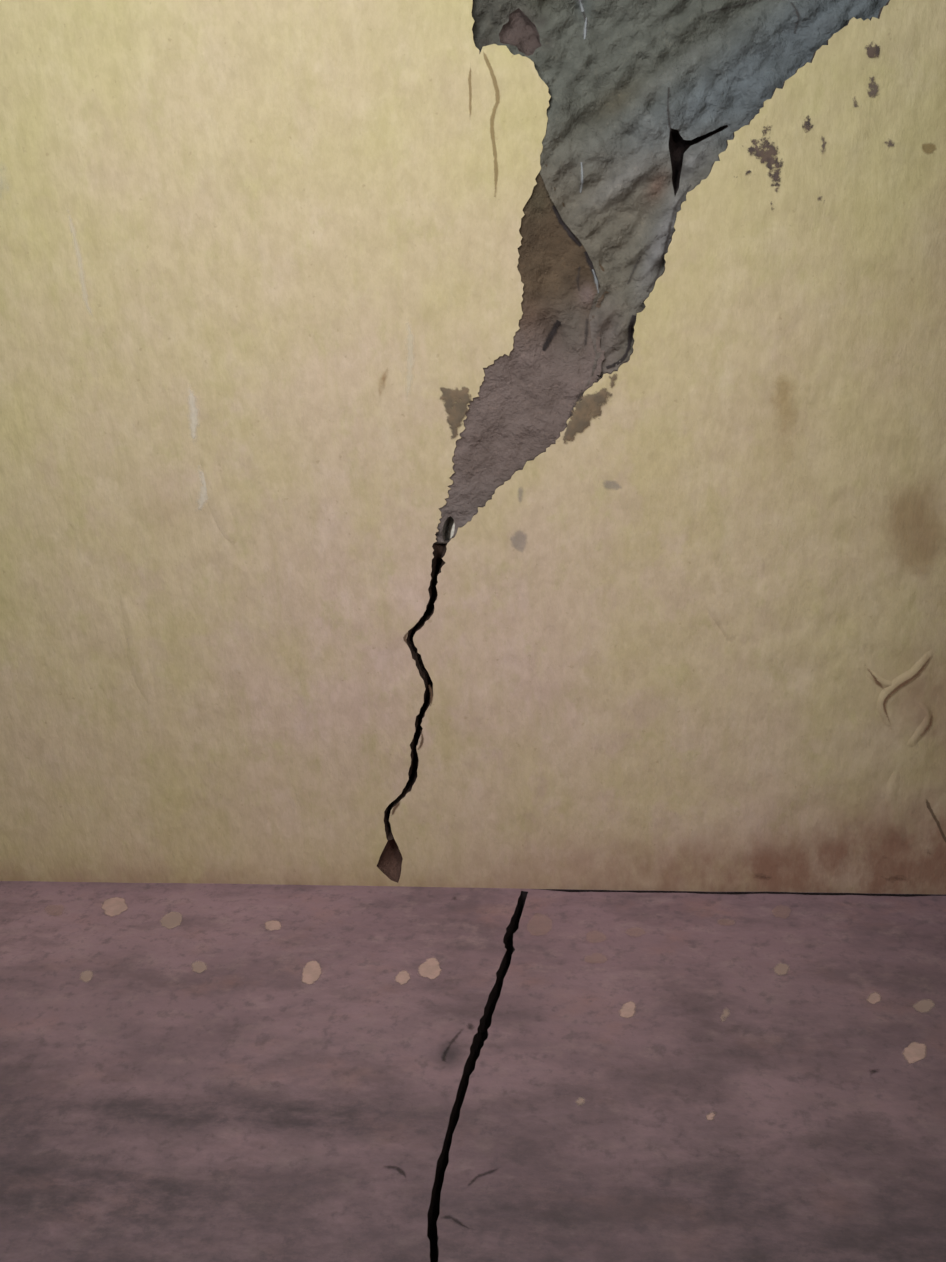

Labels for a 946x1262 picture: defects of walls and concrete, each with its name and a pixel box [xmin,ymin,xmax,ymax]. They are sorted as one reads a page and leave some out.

spalling [435,0,890,543]
crack [377,543,447,883]
crack [926,801,946,842]
crack [427,889,946,1262]